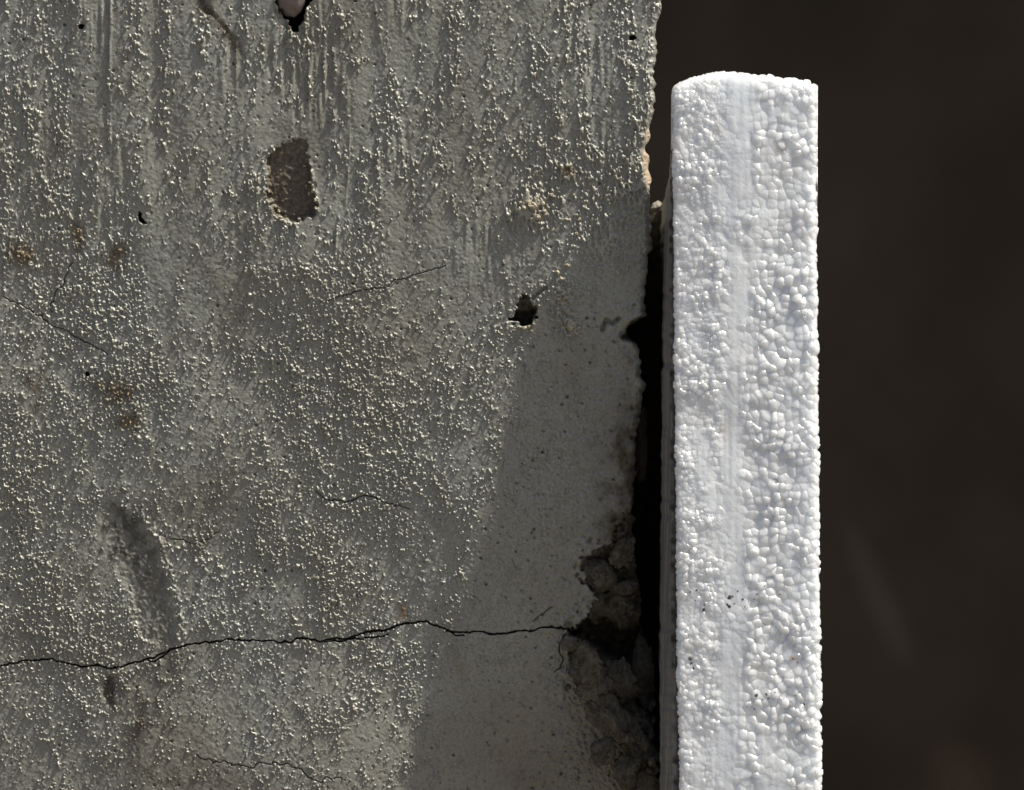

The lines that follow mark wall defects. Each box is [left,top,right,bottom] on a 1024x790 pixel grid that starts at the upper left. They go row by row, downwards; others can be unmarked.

spalling [266,138,319,223]
crack [0,620,569,669]
spalling [556,512,660,790]